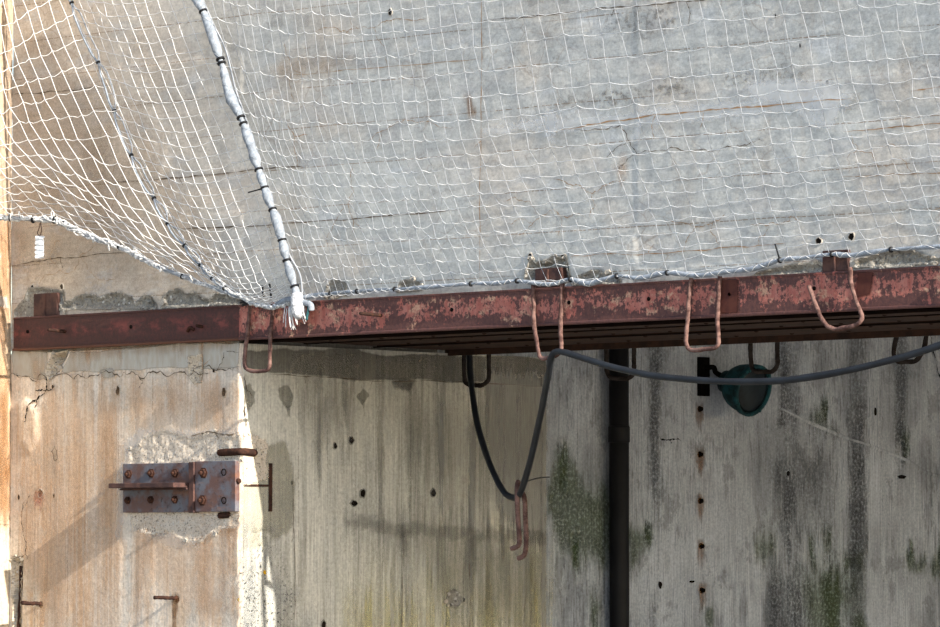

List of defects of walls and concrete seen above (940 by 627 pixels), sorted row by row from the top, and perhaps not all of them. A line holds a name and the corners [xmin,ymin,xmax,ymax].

crack [284,0,704,100]
crack [155,123,308,185]
crack [474,98,851,238]
crack [187,163,452,245]
crack [571,214,799,257]
rust [720,280,738,314]
rust [856,272,873,297]
spalling [45,350,68,388]
crack [4,351,251,559]
spalling [128,429,268,484]
spalling [131,512,240,543]
damp [825,555,862,627]